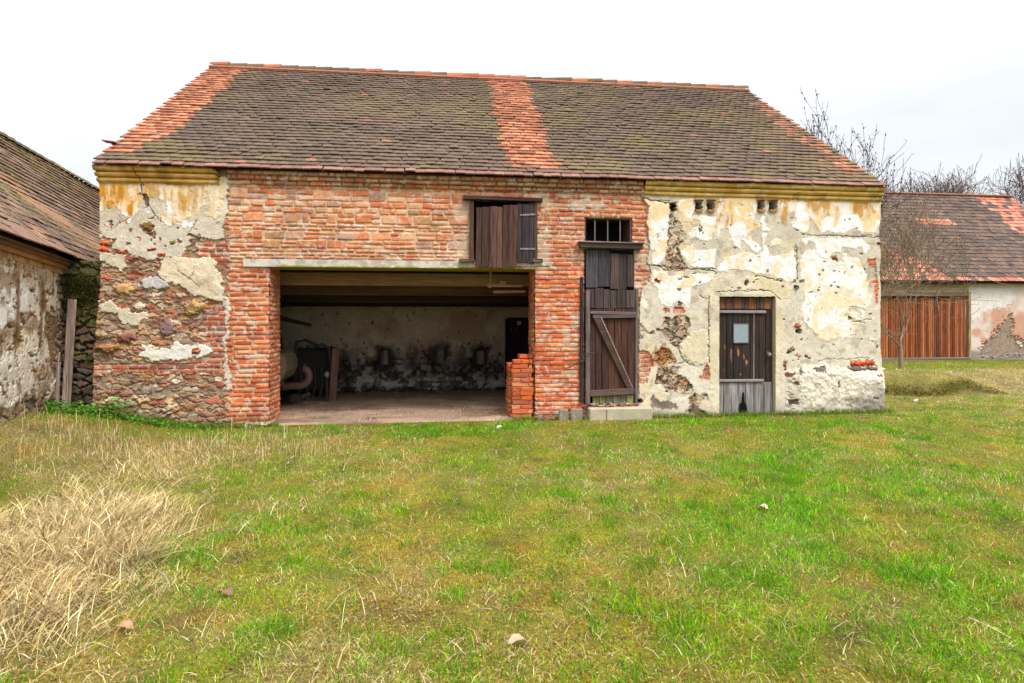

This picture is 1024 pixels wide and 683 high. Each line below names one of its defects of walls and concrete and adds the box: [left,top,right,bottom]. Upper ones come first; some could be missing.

damp [99,183,133,223]
crack [119,167,158,224]
damp [854,202,874,216]
peeling [0,276,60,410]
peeling [98,176,233,390]
peeling [639,197,881,414]
spalling [958,285,1024,360]